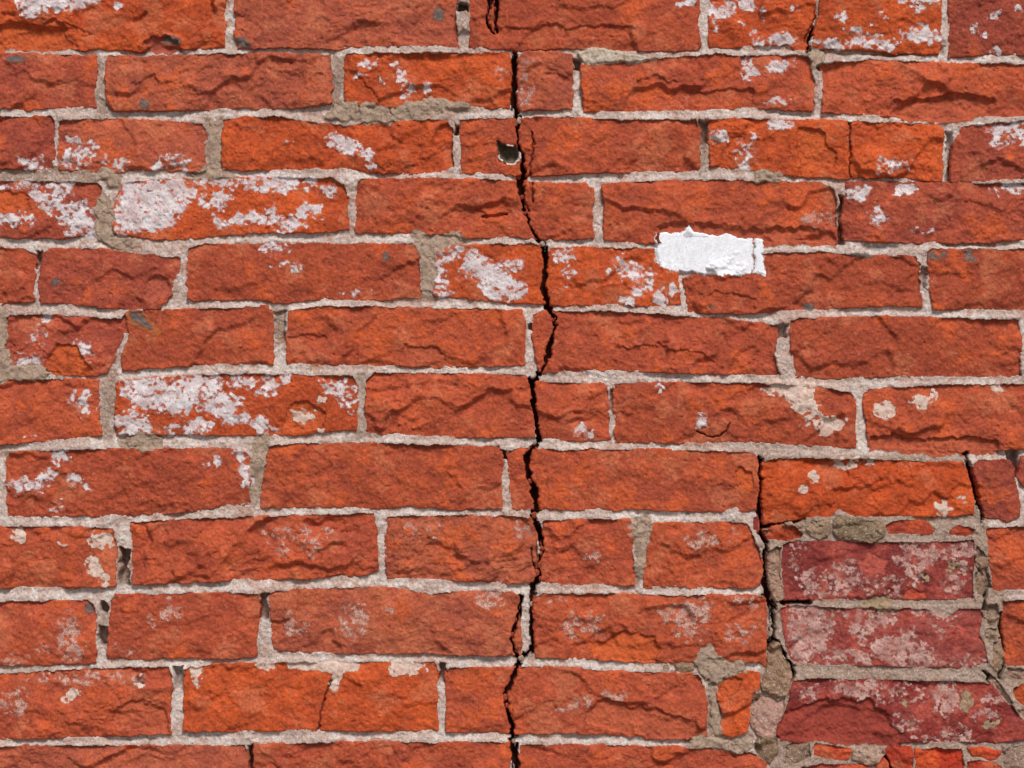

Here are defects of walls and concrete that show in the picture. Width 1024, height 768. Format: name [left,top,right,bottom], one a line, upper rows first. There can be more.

crack [486,0,499,34]
crack [481,56,557,768]
crack [755,456,807,673]
efflorescence [786,537,1004,746]